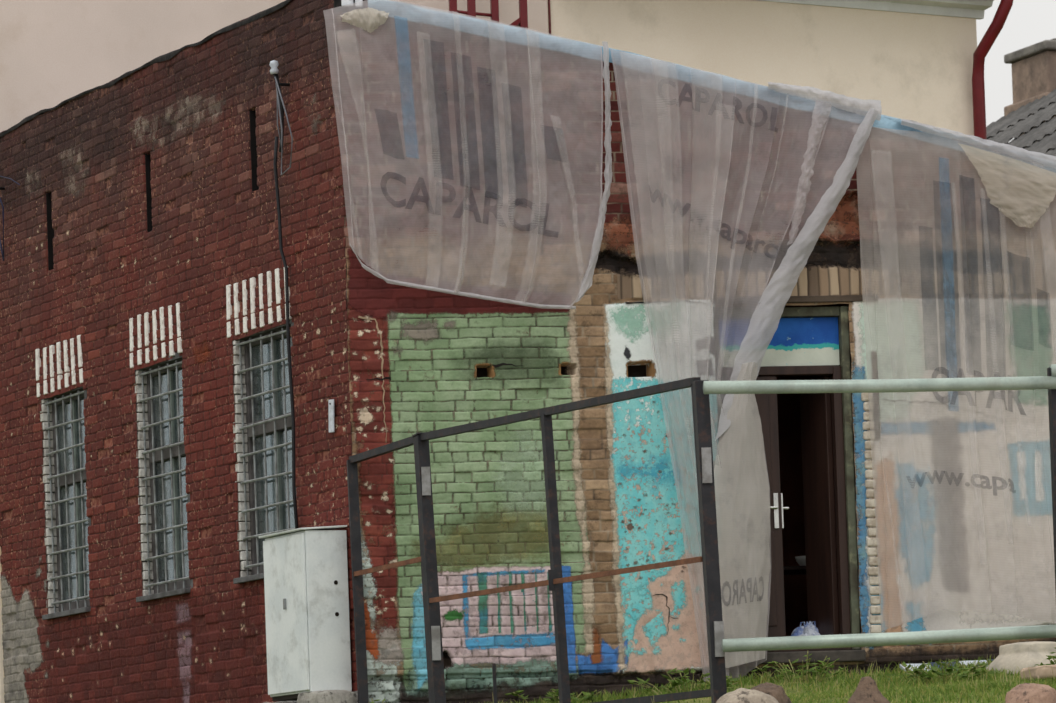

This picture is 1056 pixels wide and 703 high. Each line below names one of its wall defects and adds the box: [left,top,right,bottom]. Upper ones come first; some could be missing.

spalling [588,213,793,277]
spalling [805,191,1013,274]
flaking render [695,336,715,376]
peeling [709,394,718,468]
damp [436,434,549,568]
peeling [302,248,709,703]